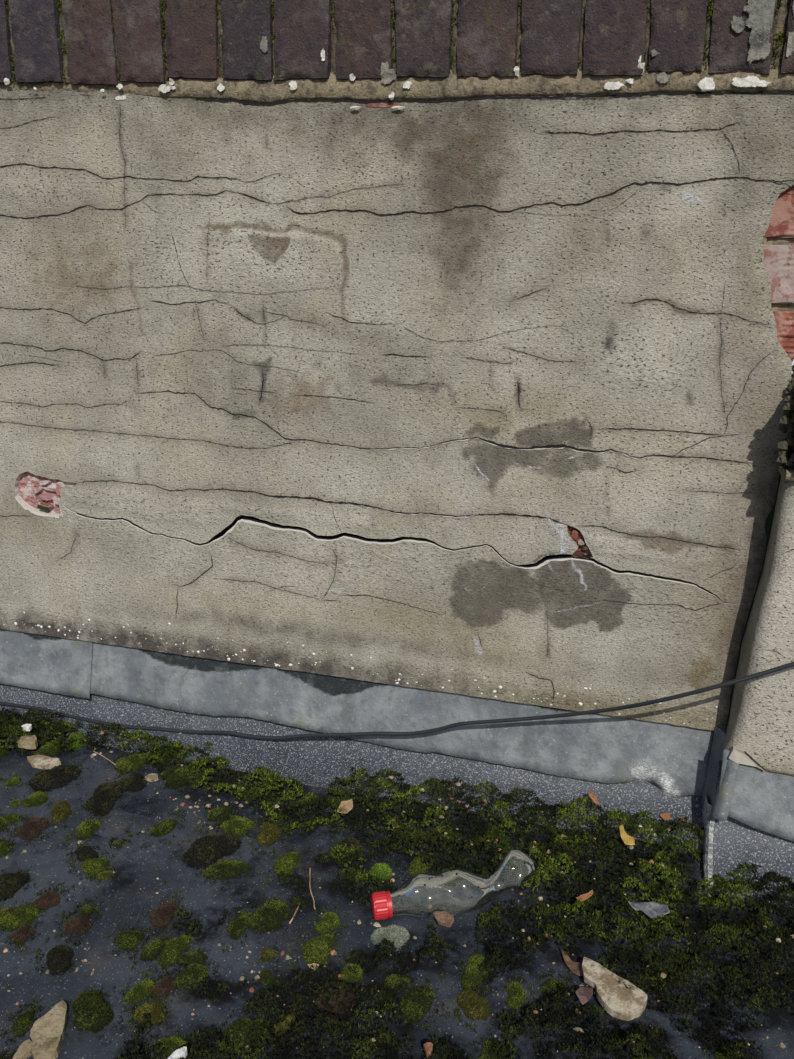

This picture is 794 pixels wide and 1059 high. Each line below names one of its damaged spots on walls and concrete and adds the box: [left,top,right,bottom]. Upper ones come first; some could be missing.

crack [0,97,58,128]
crack [197,91,794,106]
crack [0,104,794,473]
flaking render [763,185,794,362]
leakage [464,419,599,487]
spalling [14,471,77,518]
crack [60,475,794,730]
leakage [451,520,630,631]
spalling [567,525,593,559]
leakage [139,649,388,696]